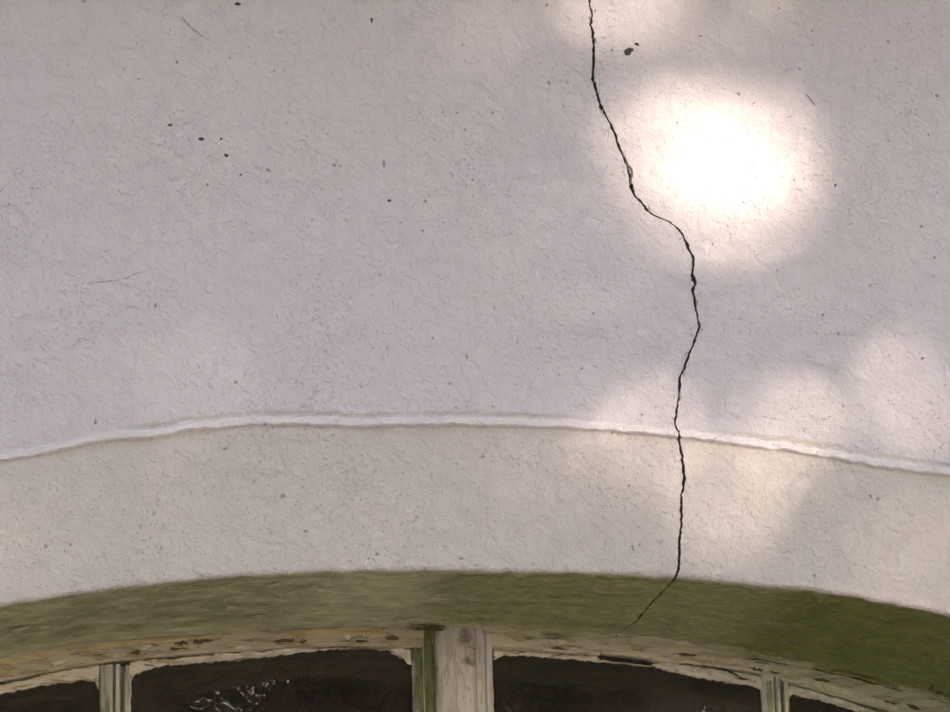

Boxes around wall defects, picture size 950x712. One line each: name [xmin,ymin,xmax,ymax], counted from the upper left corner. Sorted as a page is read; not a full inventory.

crack [588,0,705,638]